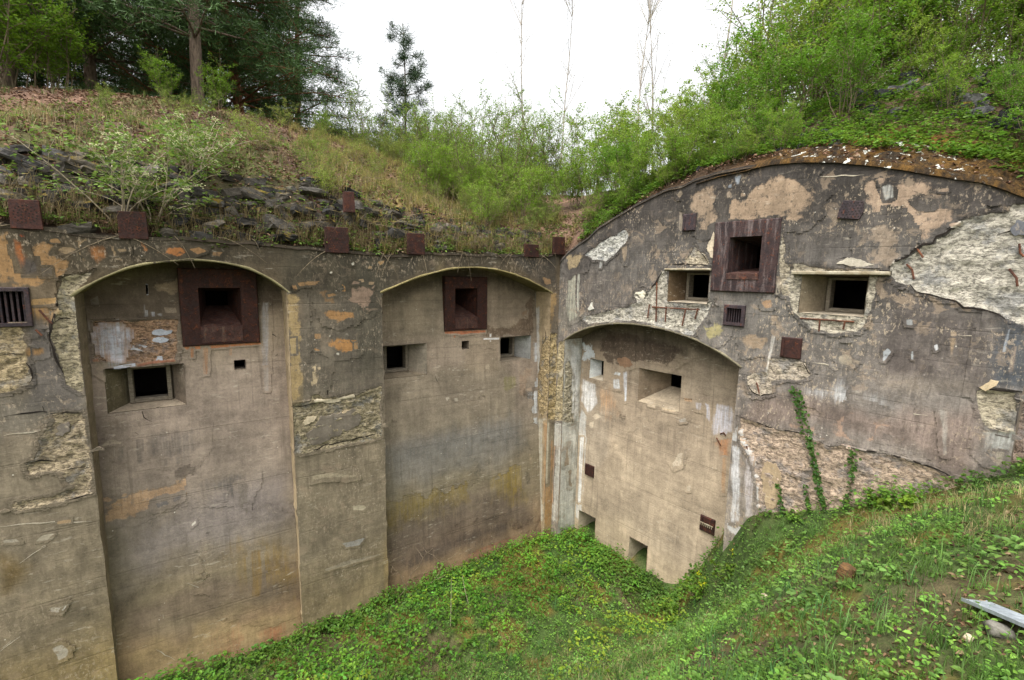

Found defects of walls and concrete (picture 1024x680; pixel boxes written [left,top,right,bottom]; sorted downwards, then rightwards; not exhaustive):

peeling [0,225,194,397]
spalling [0,408,246,532]
spalling [283,261,388,458]
peeling [475,226,631,427]
spalling [580,157,1024,400]
spalling [735,398,975,515]
spalling [970,380,1024,440]